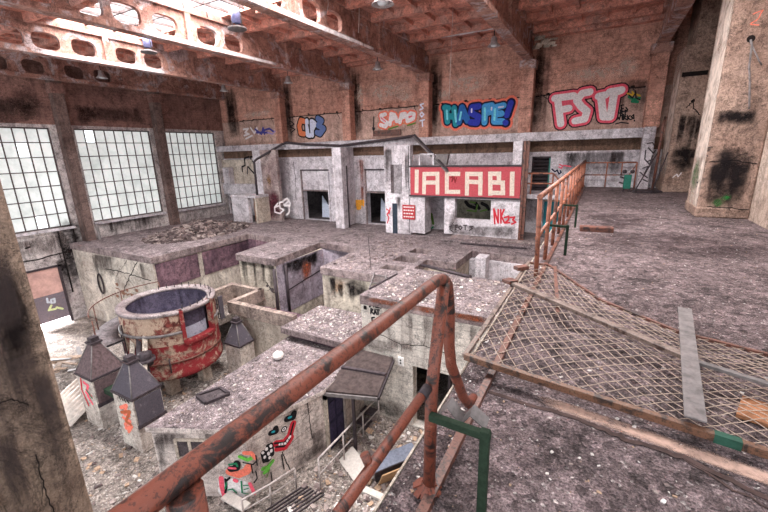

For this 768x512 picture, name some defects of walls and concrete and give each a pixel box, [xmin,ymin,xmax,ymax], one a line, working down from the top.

leakage [674,116,701,157]
leakage [711,150,749,192]